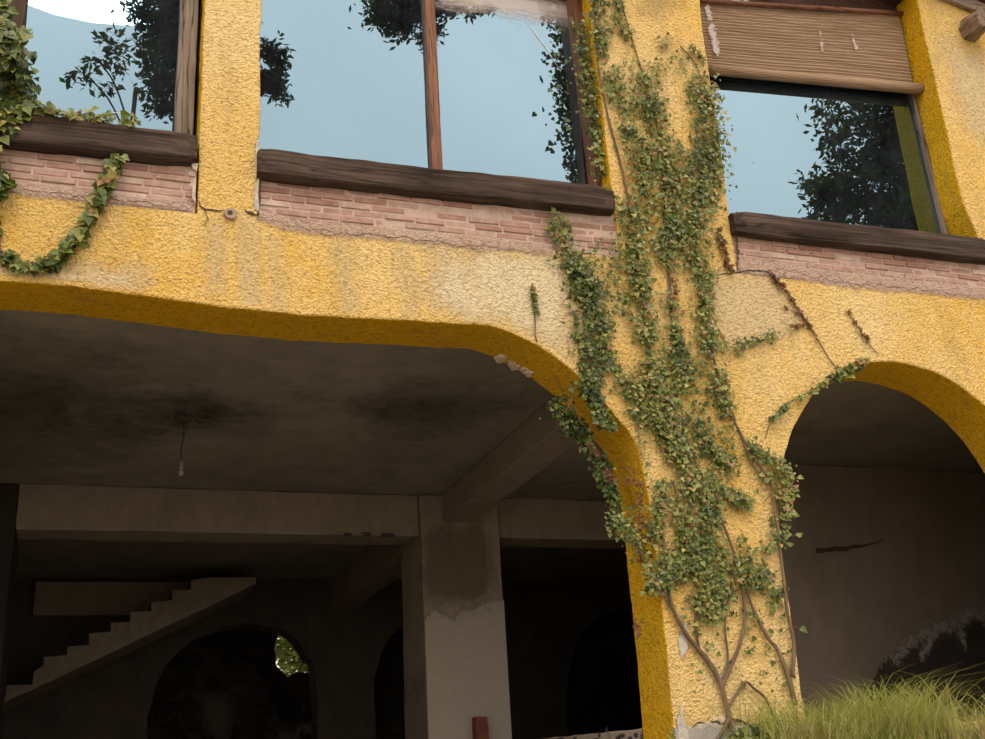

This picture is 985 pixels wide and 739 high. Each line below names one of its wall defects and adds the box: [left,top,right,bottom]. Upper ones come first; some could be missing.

spalling [494,354,534,377]
crack [816,539,884,553]